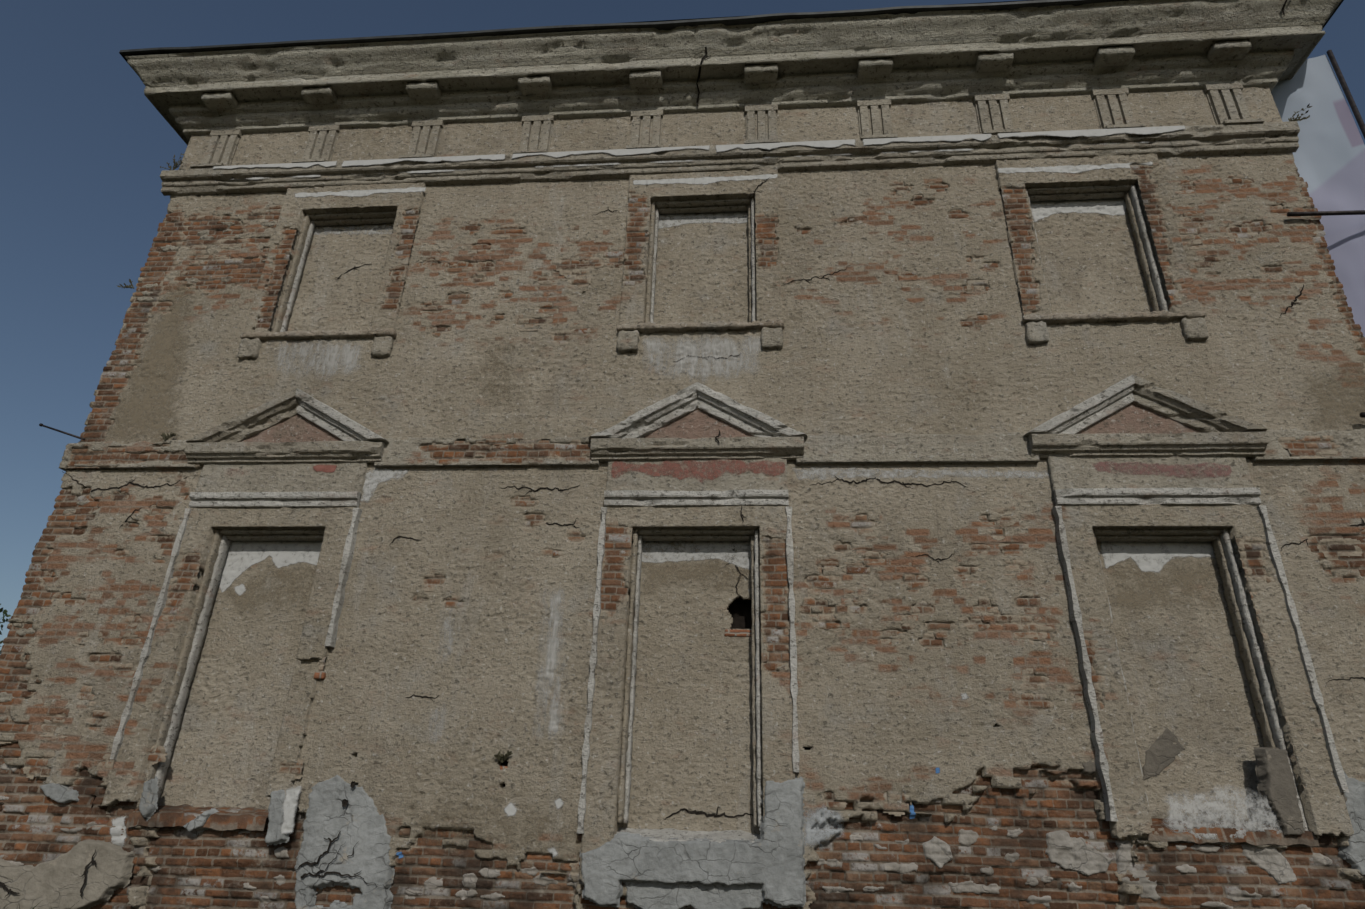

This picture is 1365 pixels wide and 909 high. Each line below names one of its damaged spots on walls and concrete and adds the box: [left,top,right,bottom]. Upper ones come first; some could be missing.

flaking render [66,125,1186,470]
crack [62,471,185,527]
crack [502,486,580,528]
crack [812,475,966,488]
peeling [219,540,323,595]
flaking render [601,514,892,675]
flaking render [0,487,306,909]
crack [80,849,96,897]
crack [292,831,381,888]
flaking render [389,826,638,909]
crack [663,808,753,820]
flaking render [763,765,1365,909]